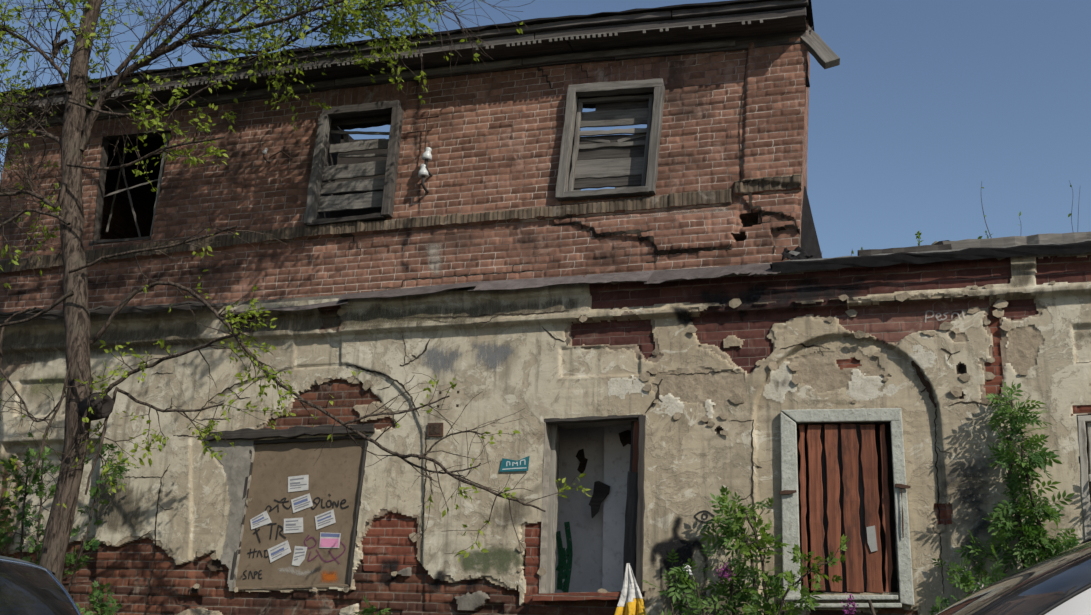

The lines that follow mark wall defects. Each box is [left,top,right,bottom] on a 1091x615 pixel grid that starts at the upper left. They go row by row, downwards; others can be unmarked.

crack [737,58,800,254]
crack [551,215,732,263]
peeling [0,349,33,396]
flaking render [255,375,397,432]
flaking render [565,255,1091,436]
crack [911,361,988,593]
flaking render [0,549,37,563]
flaking render [62,507,621,615]